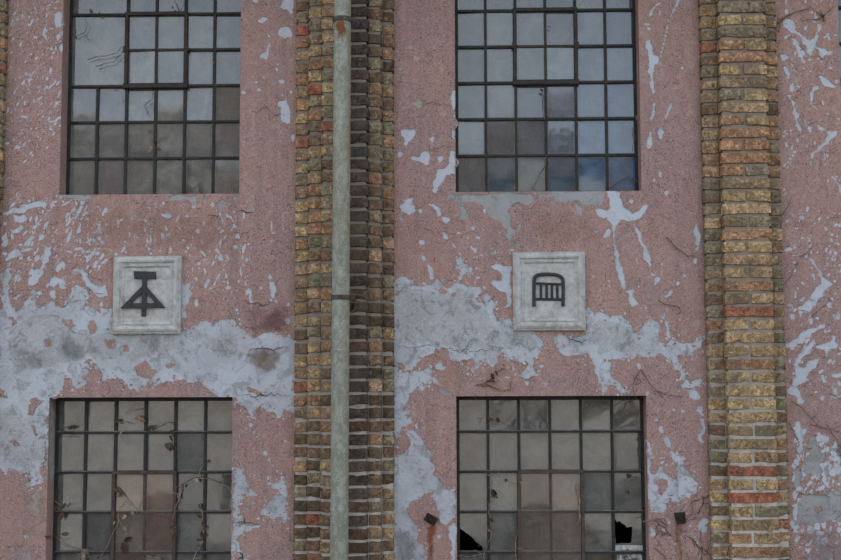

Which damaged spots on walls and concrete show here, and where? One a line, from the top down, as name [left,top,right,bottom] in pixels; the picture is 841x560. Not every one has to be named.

peeling [450,90,458,139]
peeling [781,0,838,166]
peeling [58,194,95,202]
peeling [169,194,238,224]
peeling [0,201,296,493]
peeling [393,126,706,560]
peeling [783,258,841,404]
peeling [231,463,293,560]
spalling [794,421,841,526]